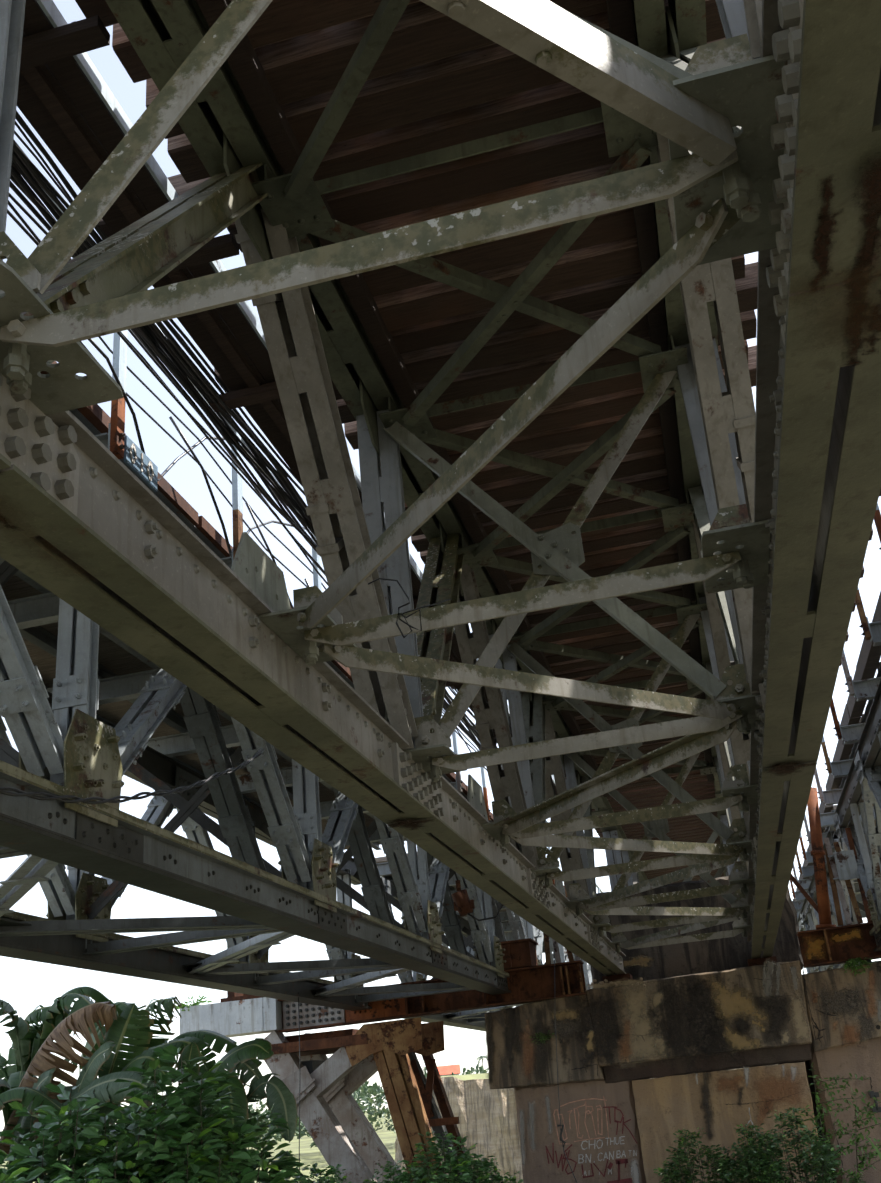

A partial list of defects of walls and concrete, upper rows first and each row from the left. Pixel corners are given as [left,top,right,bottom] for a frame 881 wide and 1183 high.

rust [811,177,843,292]
rust [844,152,881,366]
water stain [485,992,623,1083]
water stain [646,980,750,1140]
water stain [755,960,798,1042]